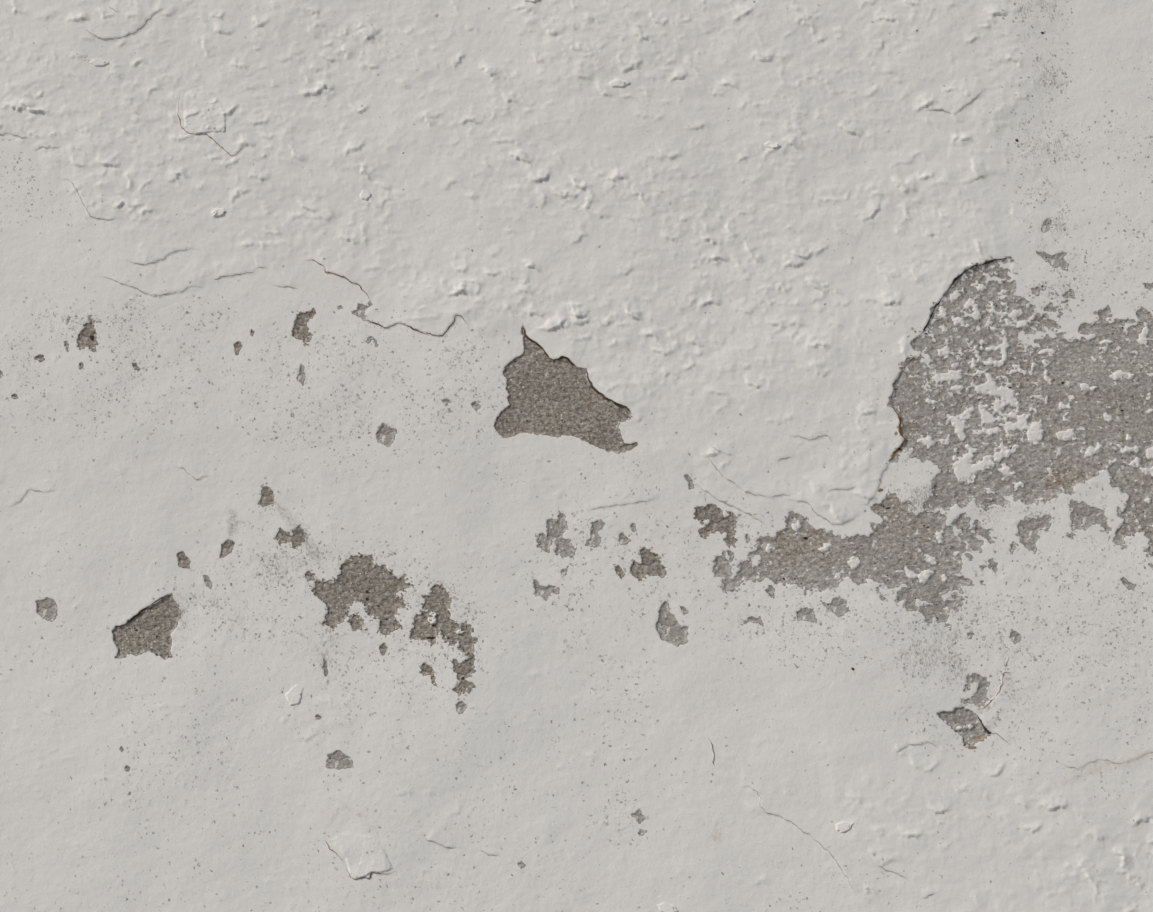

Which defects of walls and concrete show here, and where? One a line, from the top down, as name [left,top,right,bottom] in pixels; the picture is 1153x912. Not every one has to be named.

crack [312,259,465,336]
peeling [1036,251,1069,271]
flaking render [494,323,638,453]
flaking render [693,256,1153,630]
peeling [533,510,604,600]
peeling [615,523,666,581]
flaking render [112,593,181,660]
flaking render [305,552,477,714]
peeling [655,601,688,646]
flaking render [936,673,991,749]